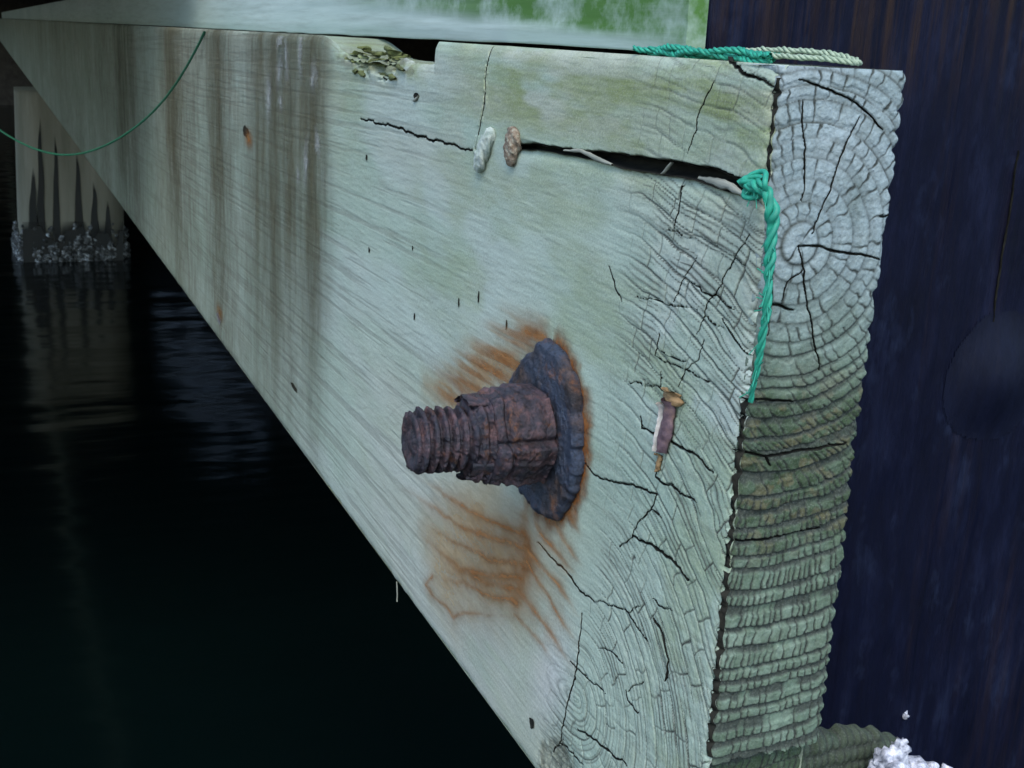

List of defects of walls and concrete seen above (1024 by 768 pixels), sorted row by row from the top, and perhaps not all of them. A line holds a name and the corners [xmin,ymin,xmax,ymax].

leakage [256,32,323,258]
crack [361,48,493,151]
crack [521,56,882,392]
corrosion [425,328,591,642]
crack [537,542,672,766]
crack [585,463,695,581]
crack [640,397,847,757]